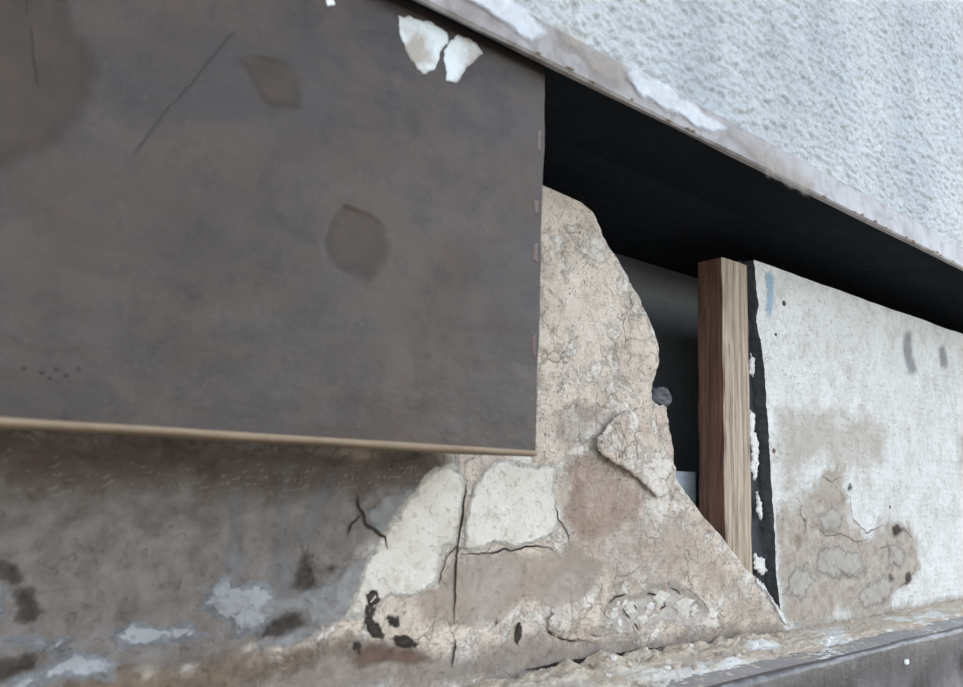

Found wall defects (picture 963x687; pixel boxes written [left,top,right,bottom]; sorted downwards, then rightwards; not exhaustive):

peeling [398,15,483,83]
peeling [596,403,676,497]
peeling [750,410,763,520]
peeling [2,635,116,687]
peeling [111,621,209,649]
crack [347,493,388,549]
damp [0,436,741,687]
peeling [200,459,564,648]
crack [439,482,569,668]
spalling [604,581,709,633]
peeling [753,553,790,627]
peeling [787,546,894,607]